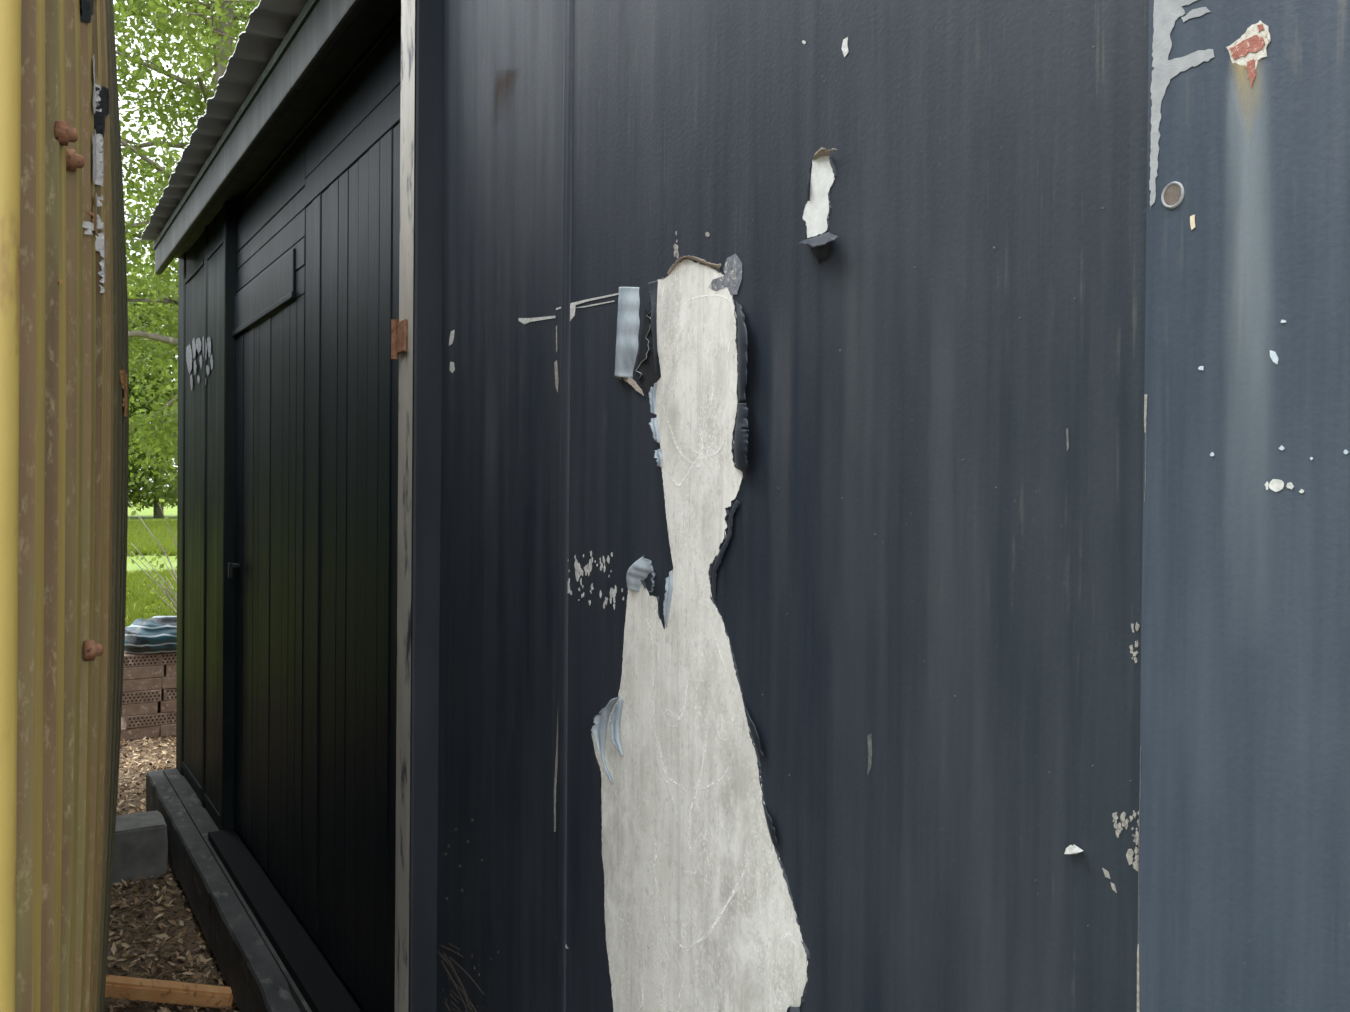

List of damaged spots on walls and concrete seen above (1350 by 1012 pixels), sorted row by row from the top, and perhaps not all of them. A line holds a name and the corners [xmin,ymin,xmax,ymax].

peeling [1149,0,1215,210]
corrosion [1226,21,1271,109]
peeling [799,147,839,264]
peeling [1264,479,1304,493]
peeling [568,231,810,1012]
spalling [1064,845,1083,854]
peeling [1112,810,1139,871]